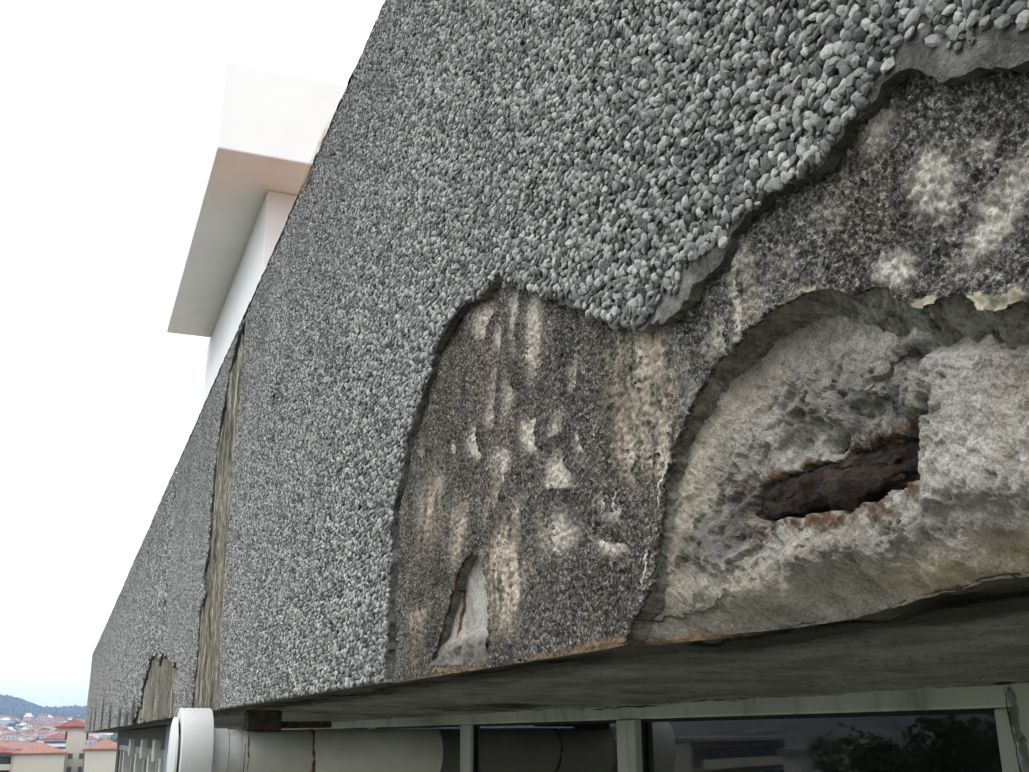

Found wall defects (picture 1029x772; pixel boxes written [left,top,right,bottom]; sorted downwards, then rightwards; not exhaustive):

efflorescence [905,150,960,223]
efflorescence [965,151,1029,263]
leakage [871,250,937,308]
leakage [965,288,1024,311]
leakage [548,244,773,506]
peeling [387,71,1029,684]
leakage [418,451,468,565]
leakage [451,288,578,633]
efflorescence [594,538,629,556]
rust [738,413,926,534]
crack [616,594,725,623]
peeling [133,656,178,725]